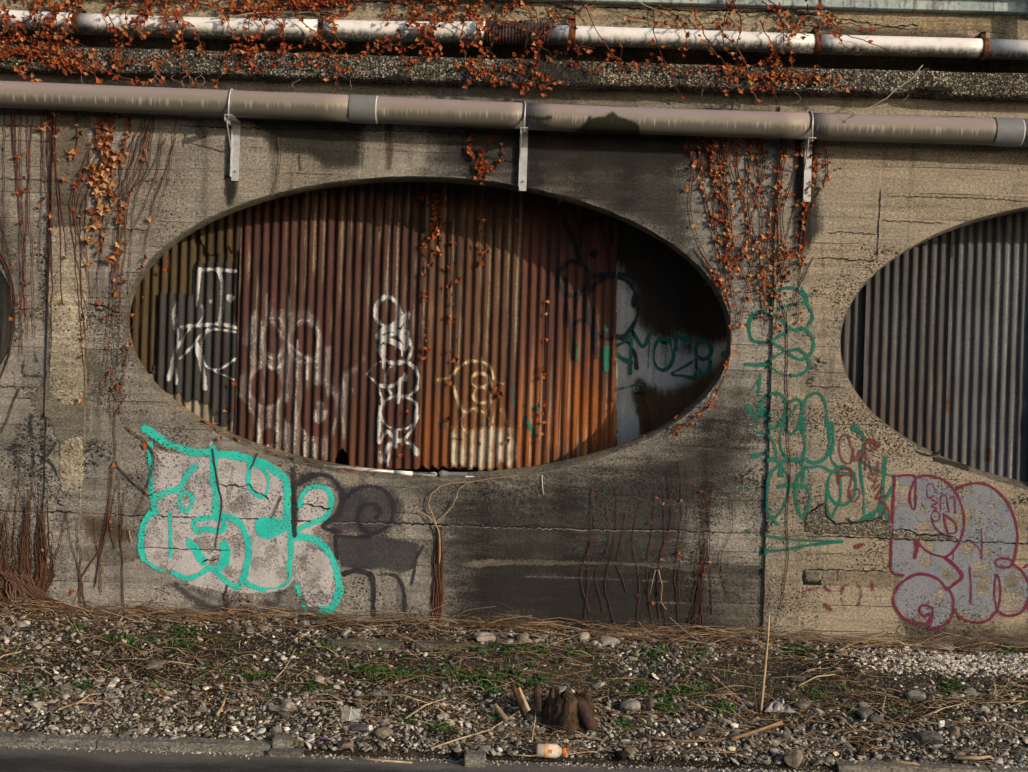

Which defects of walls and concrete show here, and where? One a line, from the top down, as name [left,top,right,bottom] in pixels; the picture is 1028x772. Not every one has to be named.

rust [523,403,539,435]
leakage [413,387,758,634]
crack [805,535,1028,573]